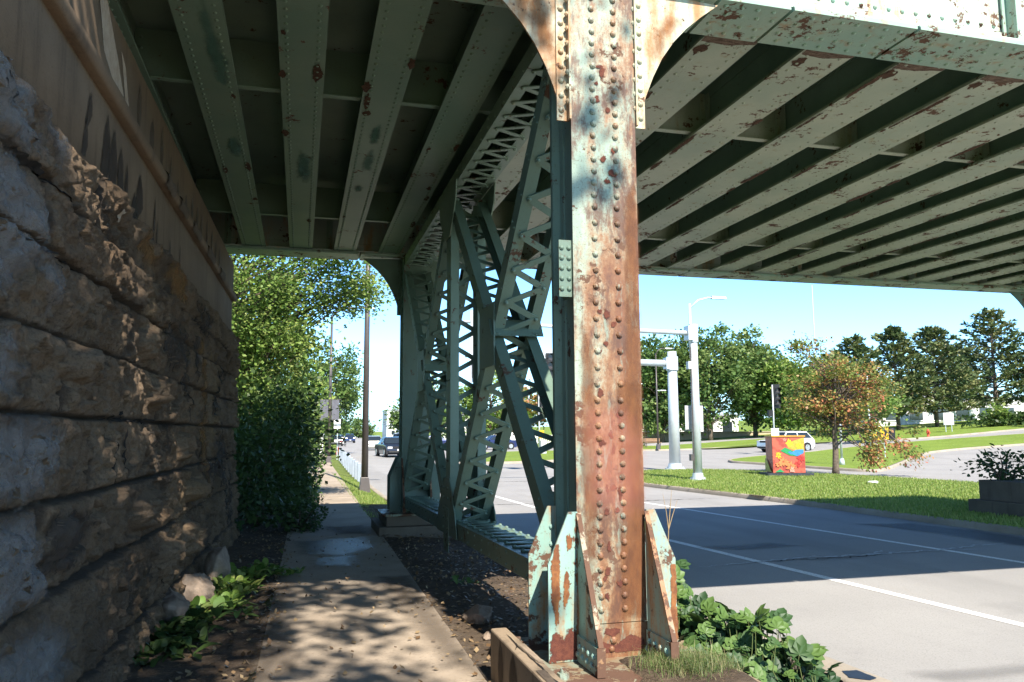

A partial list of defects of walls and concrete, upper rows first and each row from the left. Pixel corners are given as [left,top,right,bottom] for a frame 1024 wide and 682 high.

corrosion [527,0,552,48]
corrosion [594,65,610,113]
corrosion [600,148,616,184]
corrosion [605,484,623,515]
corrosion [603,567,623,601]